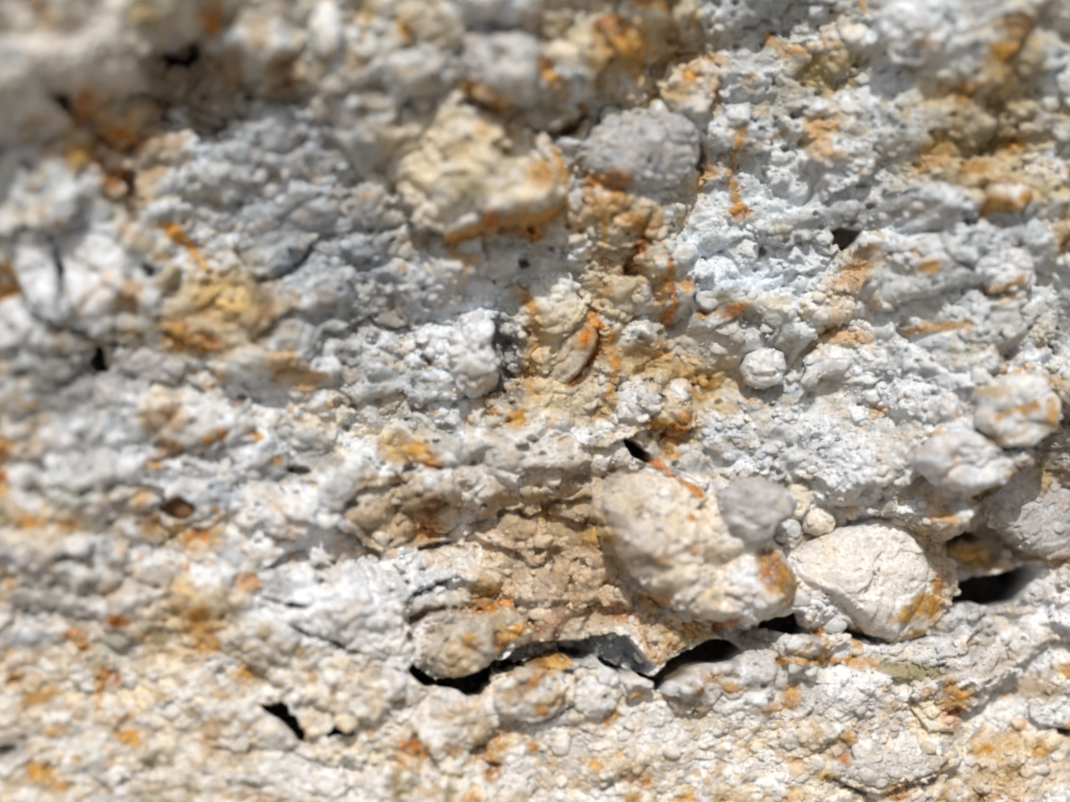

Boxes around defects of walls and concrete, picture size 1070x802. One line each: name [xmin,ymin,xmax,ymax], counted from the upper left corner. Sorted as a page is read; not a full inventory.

corrosion [442,149,568,246]
corrosion [728,182,750,219]
corrosion [583,169,696,327]
corrosion [513,288,544,390]
corrosion [568,309,717,418]
corrosion [359,430,442,485]
corrosion [505,407,528,429]
corrosion [646,411,704,499]
crack [408,634,735,695]